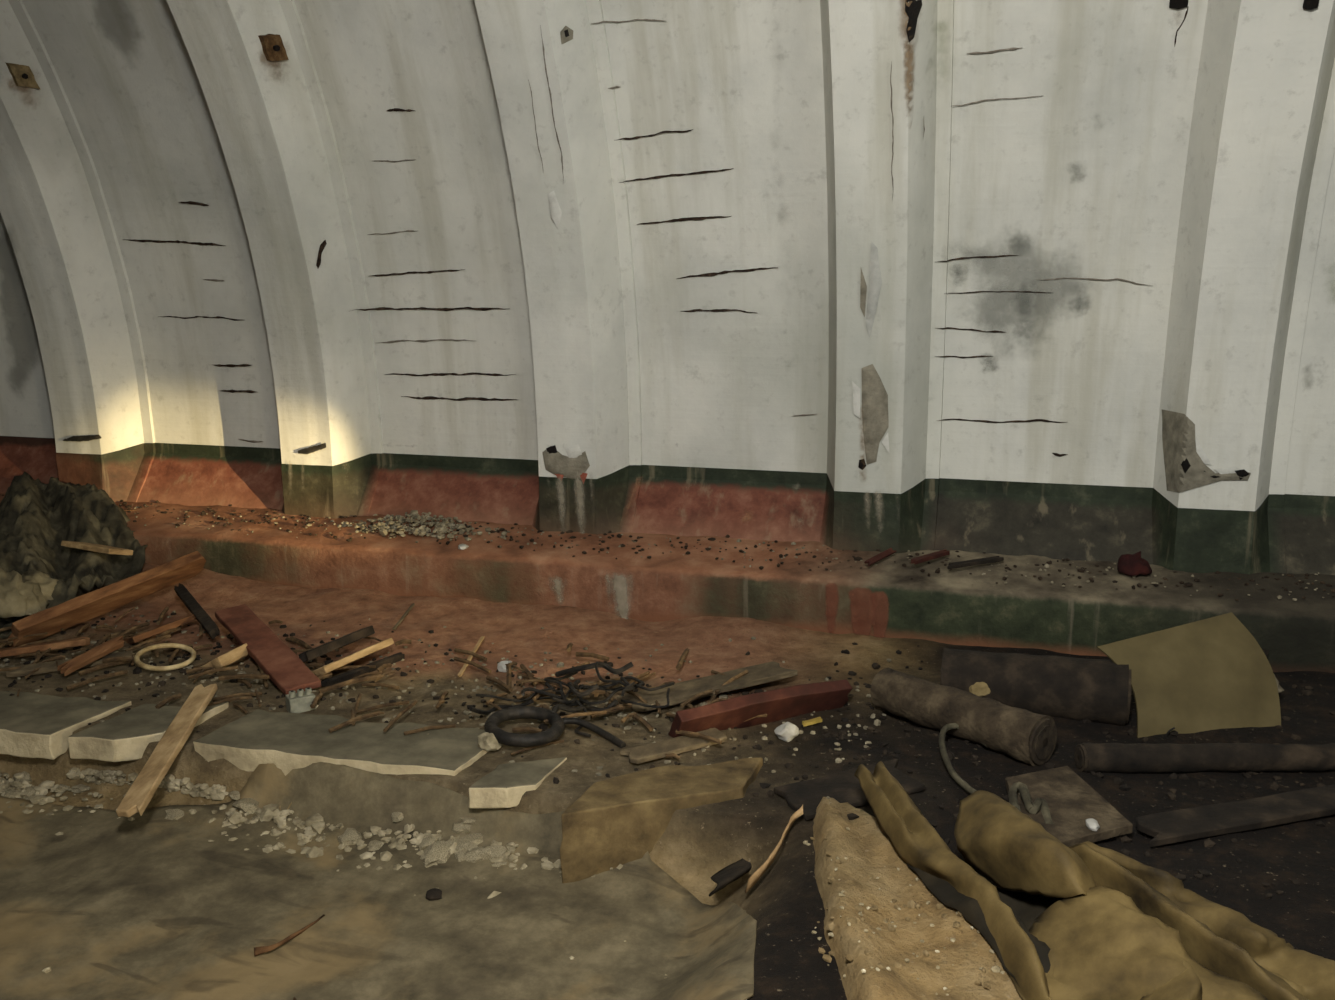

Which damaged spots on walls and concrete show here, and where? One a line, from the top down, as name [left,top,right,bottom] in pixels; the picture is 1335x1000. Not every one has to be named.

corrosion [903,0,914,110]
crack [614,129,693,141]
crack [619,168,734,183]
crack [637,216,731,225]
crack [677,267,778,279]
damp [984,238,1086,325]
crack [937,255,1151,294]
crack [352,269,517,401]
crack [934,327,1003,358]
peeling [852,364,890,470]
flaking render [542,444,590,484]
flaking render [1162,409,1251,493]